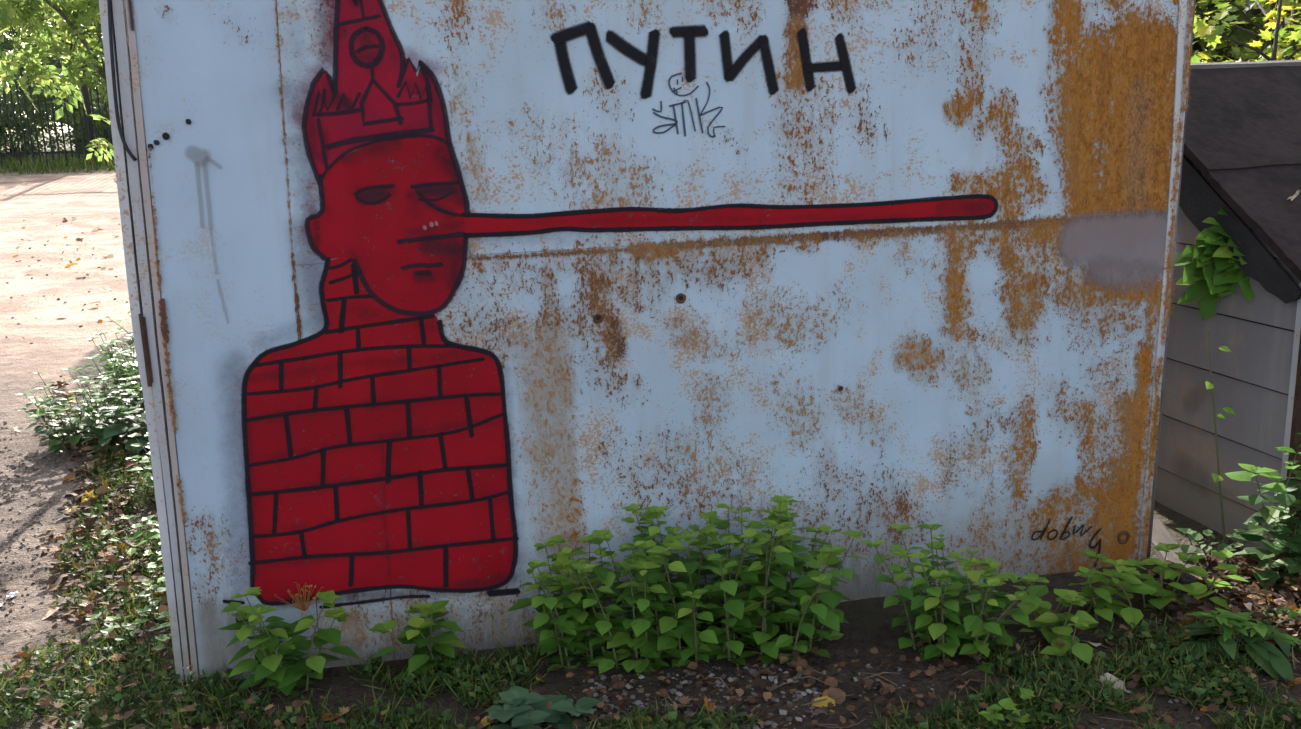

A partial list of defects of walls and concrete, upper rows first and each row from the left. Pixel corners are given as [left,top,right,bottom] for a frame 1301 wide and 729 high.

rust [147,147,178,434]
rust [224,3,303,340]
rust [434,0,1195,582]
rust [174,475,246,608]